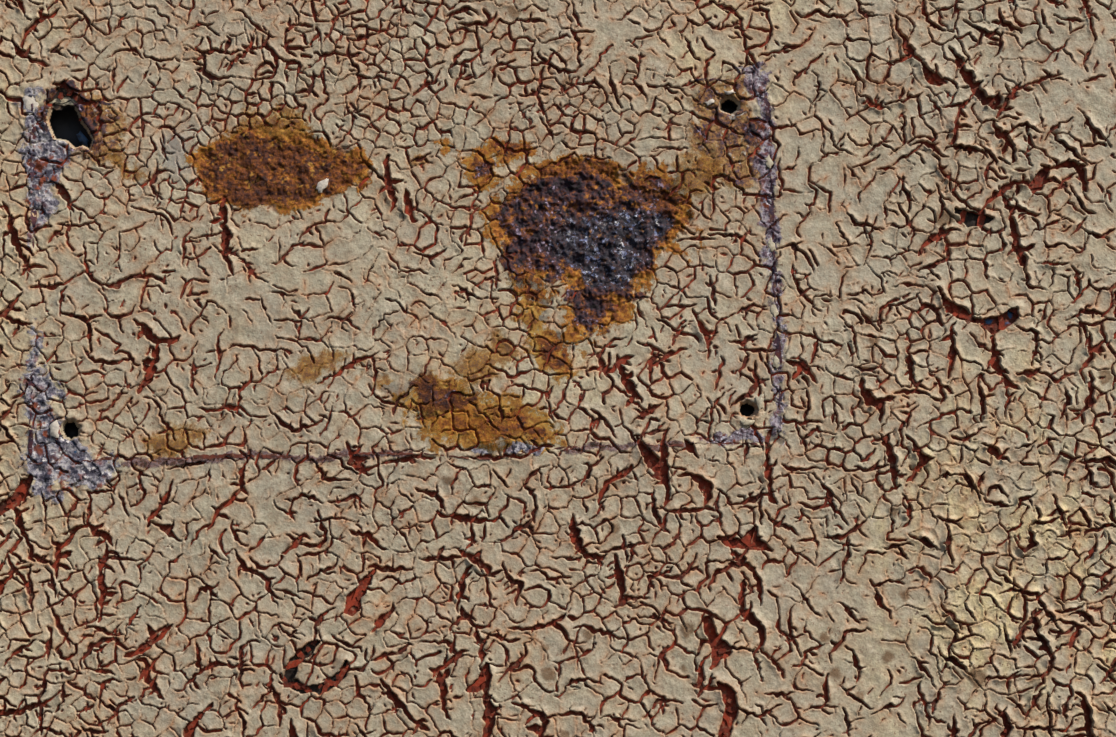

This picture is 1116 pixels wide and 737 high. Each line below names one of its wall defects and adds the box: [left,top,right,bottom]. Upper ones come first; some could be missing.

crack [112,10,390,90]
corrosion [184,103,378,217]
crack [709,0,846,73]
crack [893,0,1113,290]
corrosion [375,75,762,455]
crack [0,202,628,737]
crack [588,338,777,532]
crack [703,161,981,618]
crack [977,292,1116,462]
crack [566,514,802,724]
crack [914,603,981,680]
crack [994,588,1093,737]